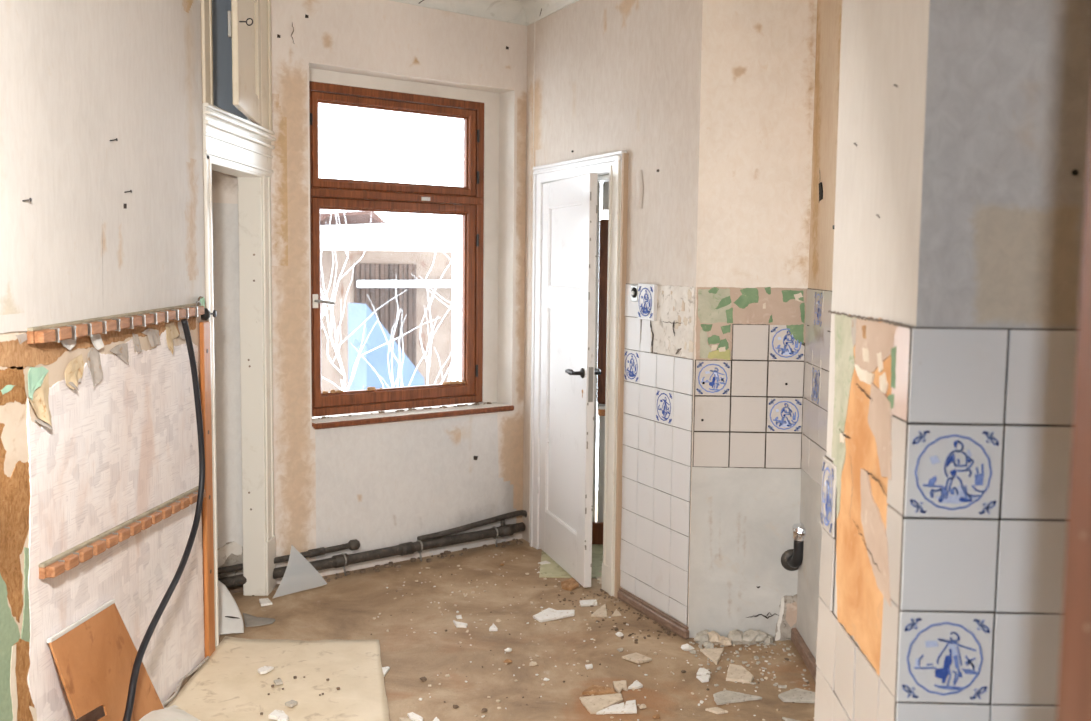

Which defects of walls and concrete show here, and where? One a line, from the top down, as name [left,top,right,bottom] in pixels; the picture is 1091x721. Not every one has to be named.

peeling [0,317,196,405]
peeling [0,423,30,623]
peeling [10,639,37,721]